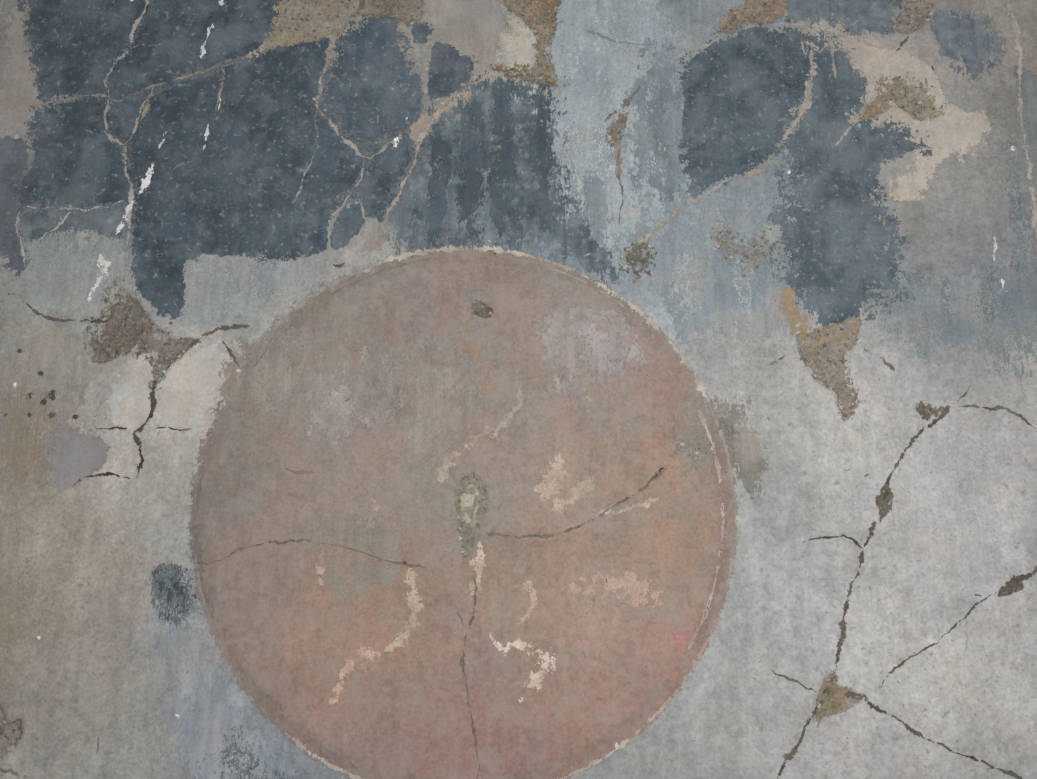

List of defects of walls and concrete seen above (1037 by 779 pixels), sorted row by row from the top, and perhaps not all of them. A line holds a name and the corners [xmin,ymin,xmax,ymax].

crack [8,0,553,324]
peeling [0,0,659,490]
crack [554,9,909,260]
peeling [652,0,1008,421]
flaking render [0,704,24,761]
crack [0,768,26,778]
crack [201,539,426,568]
crack [457,556,480,779]
flaking render [454,472,490,559]
crack [487,468,666,539]
crack [772,386,1037,779]